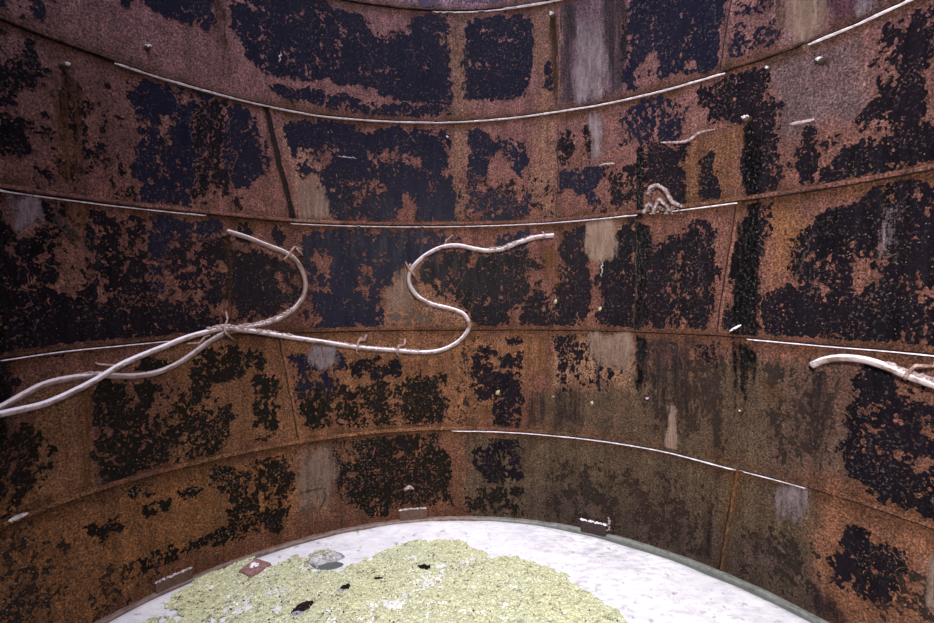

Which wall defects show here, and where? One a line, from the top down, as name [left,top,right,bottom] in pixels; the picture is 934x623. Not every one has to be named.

corrosion [549,20,557,101]
leakage [560,0,627,104]
leakage [777,0,827,48]
leakage [589,114,603,157]
corrosion [660,129,715,144]
peeling [0,0,934,457]
corrosion [205,305,295,336]
corrosion [885,361,934,383]
peeling [81,343,298,623]
peeling [285,335,526,520]
peeling [761,356,934,522]
peeling [737,522,934,623]